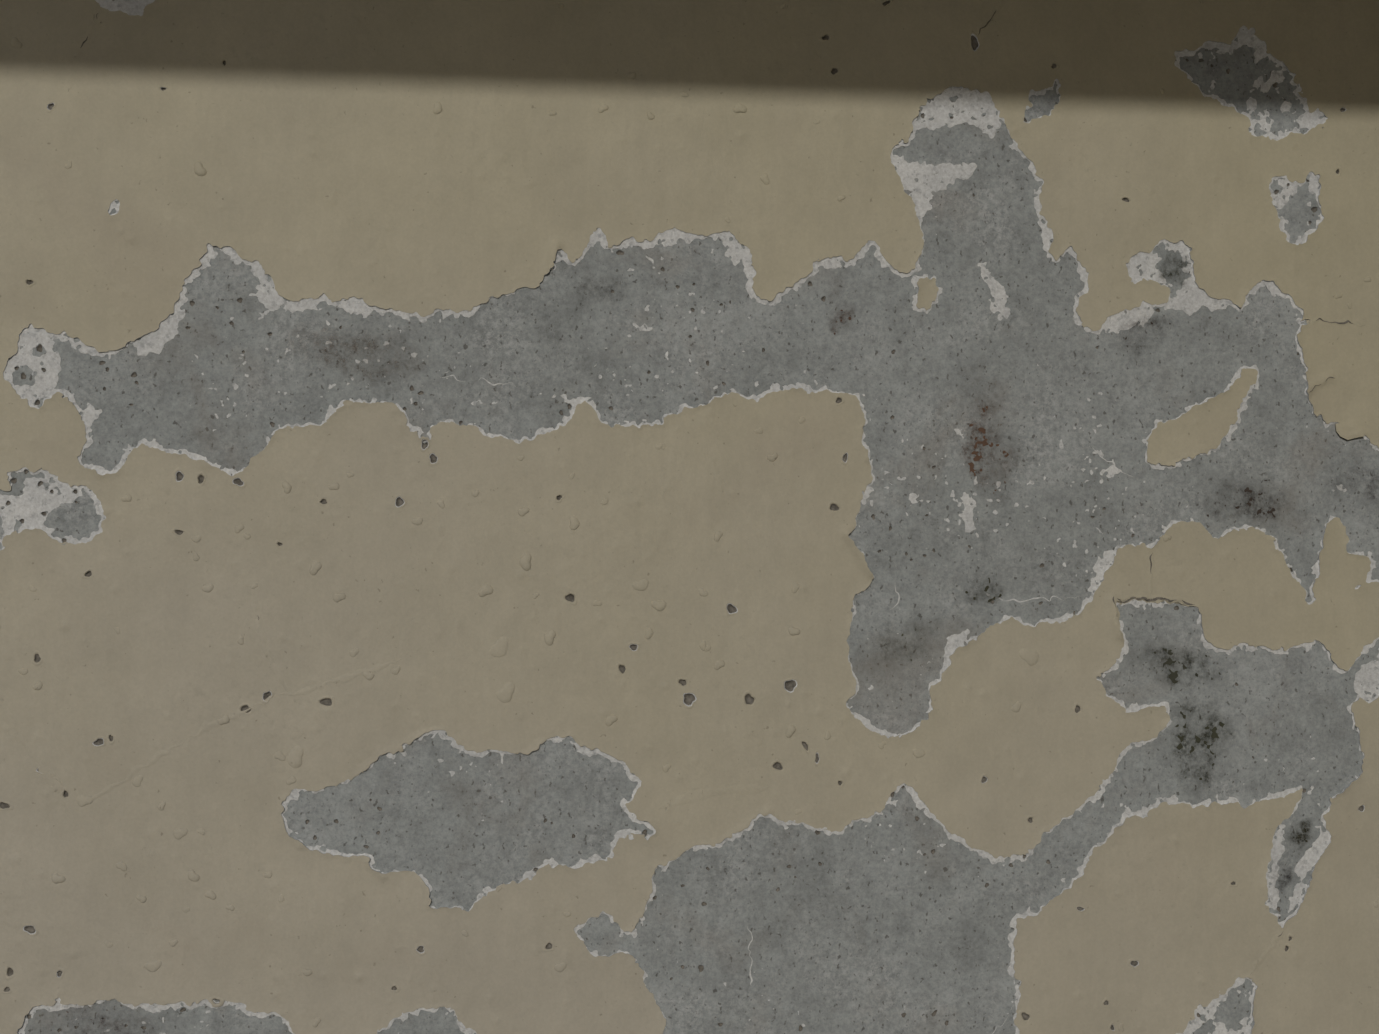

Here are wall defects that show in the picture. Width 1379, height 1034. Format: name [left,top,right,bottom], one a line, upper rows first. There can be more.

peeling [95,0,155,16]
peeling [1174,25,1349,141]
peeling [0,61,1379,738]
spalling [90,734,115,748]
peeling [281,730,656,911]
peeling [574,599,1379,1034]
spalling [21,924,39,936]
peeling [18,996,294,1034]
peeling [377,1007,477,1034]